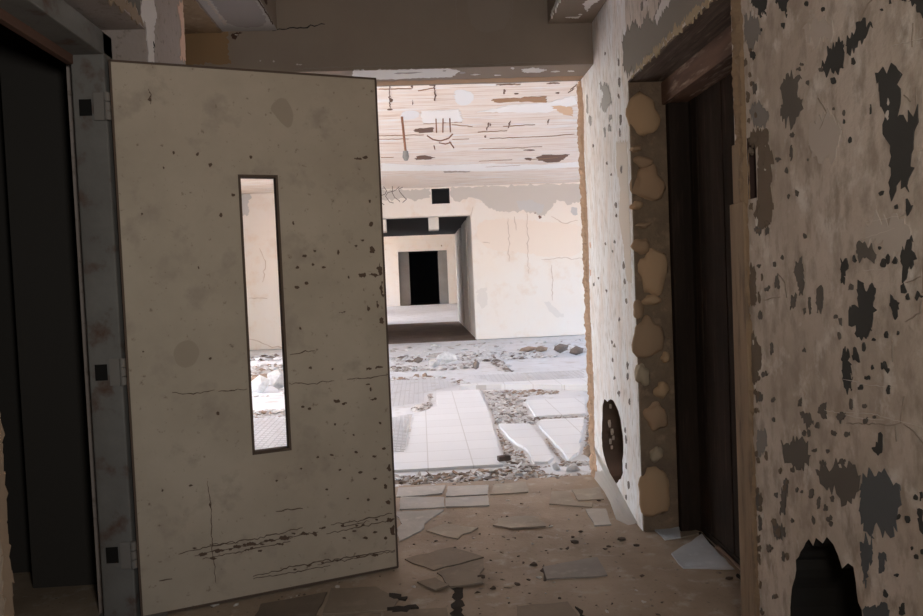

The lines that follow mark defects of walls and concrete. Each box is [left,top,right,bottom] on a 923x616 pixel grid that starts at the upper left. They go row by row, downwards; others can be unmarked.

peeling [550,0,600,19]
peeling [818,17,873,84]
peeling [869,63,919,216]
peeling [880,0,923,18]
peeling [352,67,623,483]
spalling [599,0,718,531]
spalling [730,0,809,616]
spalling [0,413,14,616]
spalling [772,235,923,616]